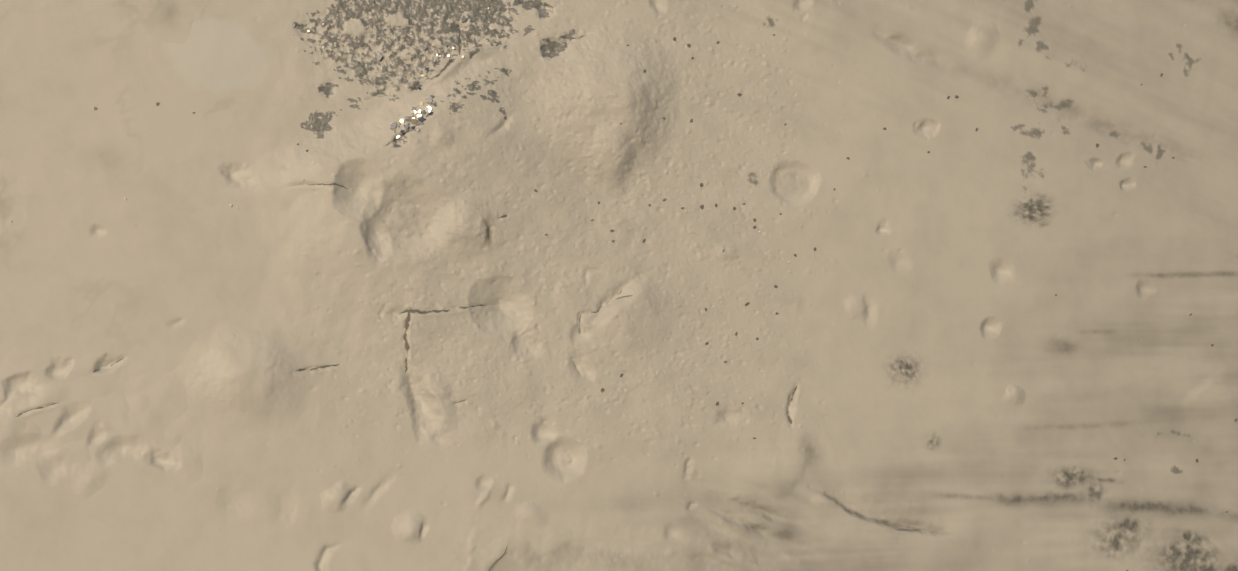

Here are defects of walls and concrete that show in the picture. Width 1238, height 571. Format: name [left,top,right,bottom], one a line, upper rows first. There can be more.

peeling [280,0,589,144]
crack [400,305,483,373]